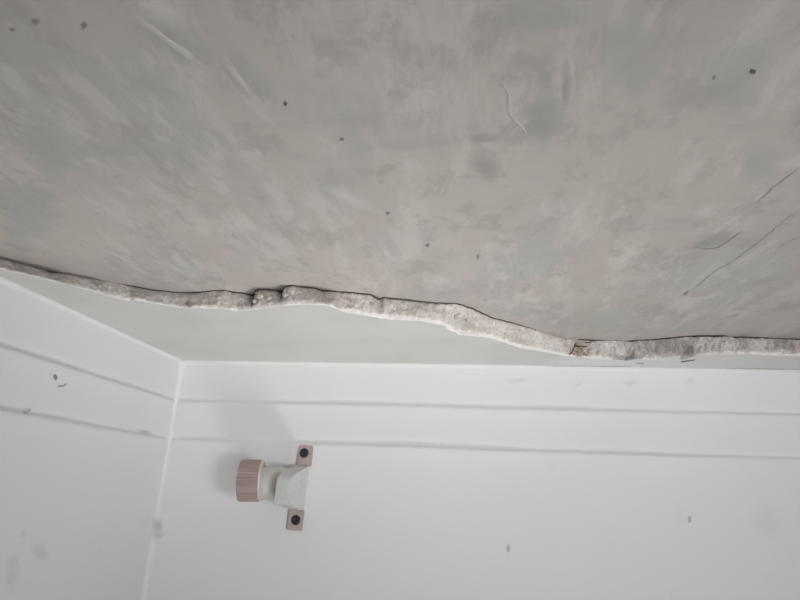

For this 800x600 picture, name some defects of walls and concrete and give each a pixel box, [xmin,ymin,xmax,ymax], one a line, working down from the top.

crack [758,167,800,201]
crack [689,211,799,291]
flaking render [0,258,800,369]